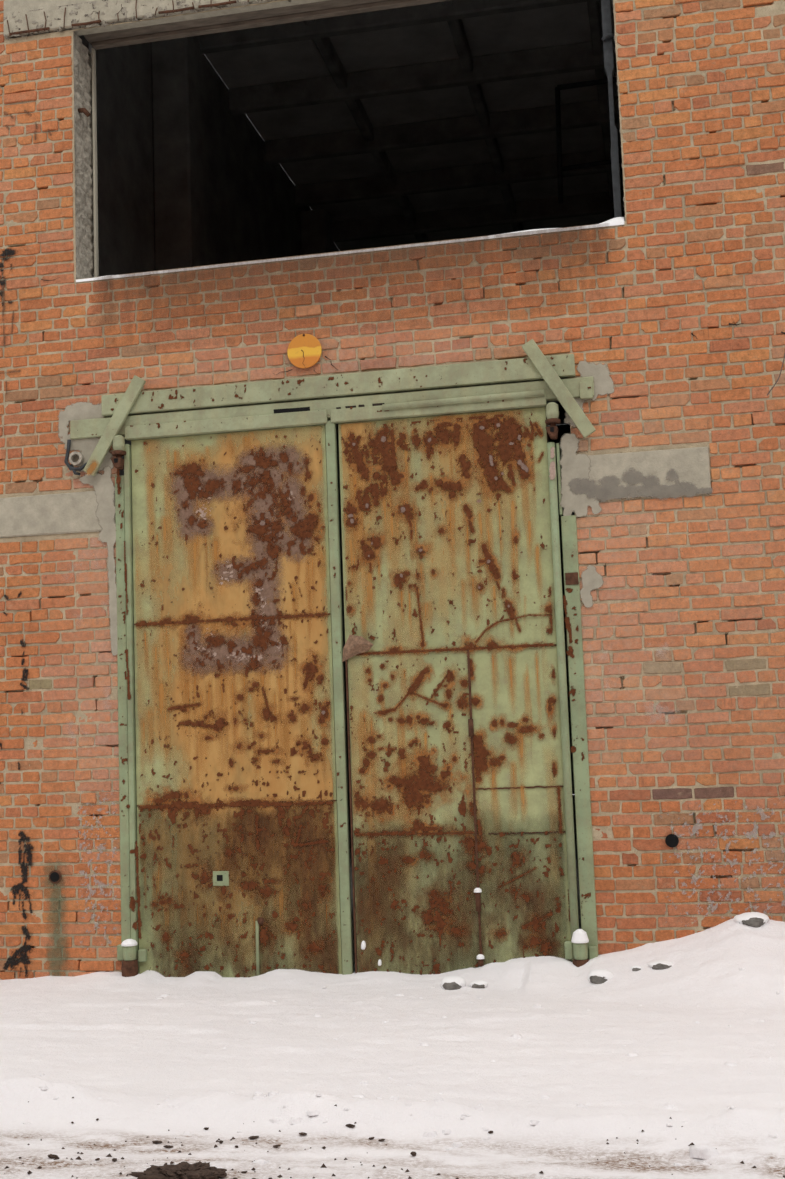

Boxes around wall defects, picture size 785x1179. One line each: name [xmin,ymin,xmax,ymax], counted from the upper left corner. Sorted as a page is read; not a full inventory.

spalling [4,0,291,40]
corrosion [116,400,591,978]